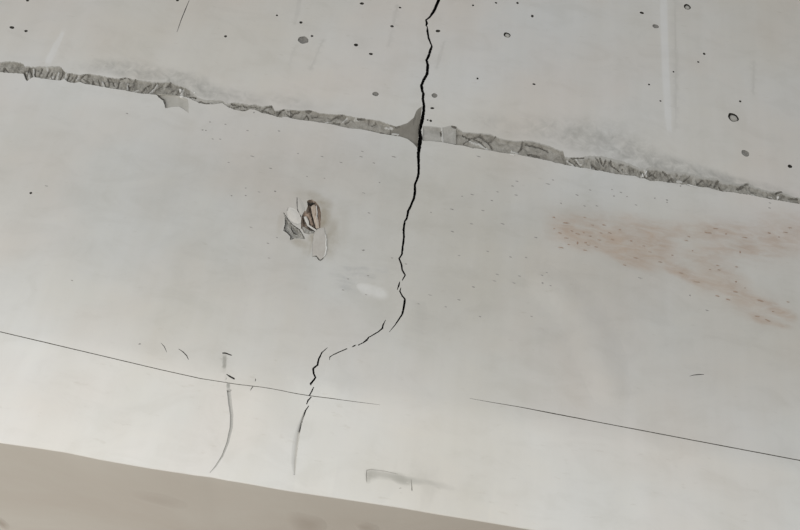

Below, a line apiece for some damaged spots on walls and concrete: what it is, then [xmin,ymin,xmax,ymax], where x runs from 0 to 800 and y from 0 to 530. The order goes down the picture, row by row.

spalling [156,89,196,113]
spalling [390,107,422,147]
crack [0,0,440,475]
spalling [269,183,361,266]
rust [519,190,800,344]